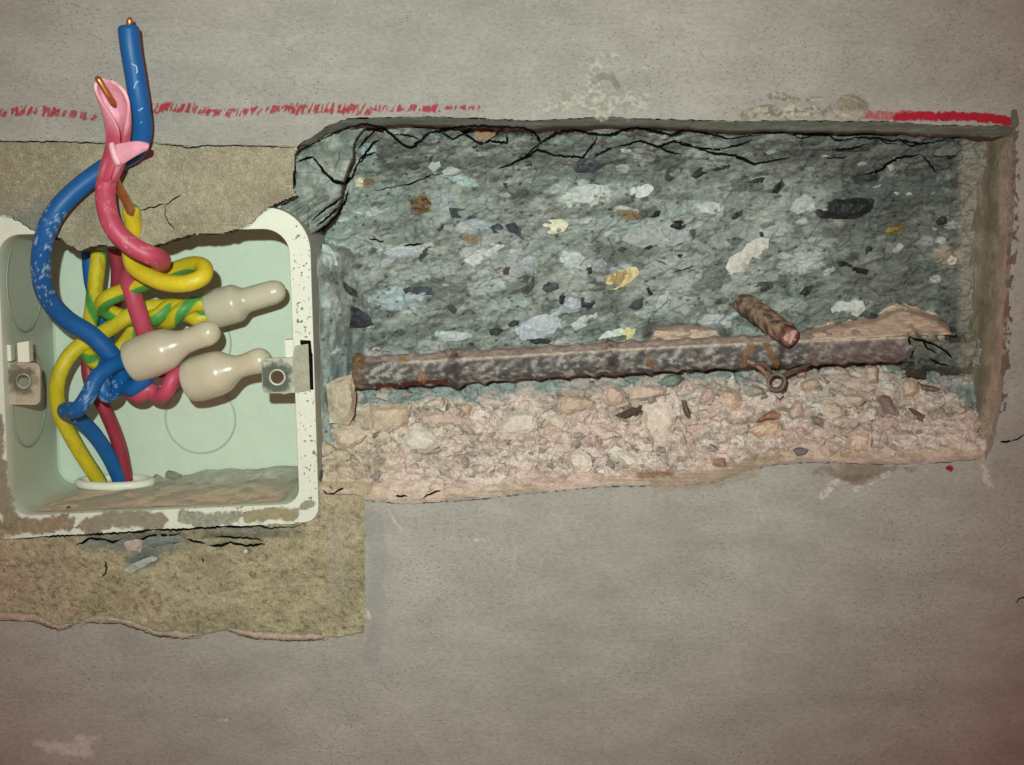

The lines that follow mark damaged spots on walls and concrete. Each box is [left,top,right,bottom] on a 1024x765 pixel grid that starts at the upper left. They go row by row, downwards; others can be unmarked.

crack [156,123,955,232]
spalling [0,102,1015,642]
crack [908,335,952,366]
crack [21,521,308,577]